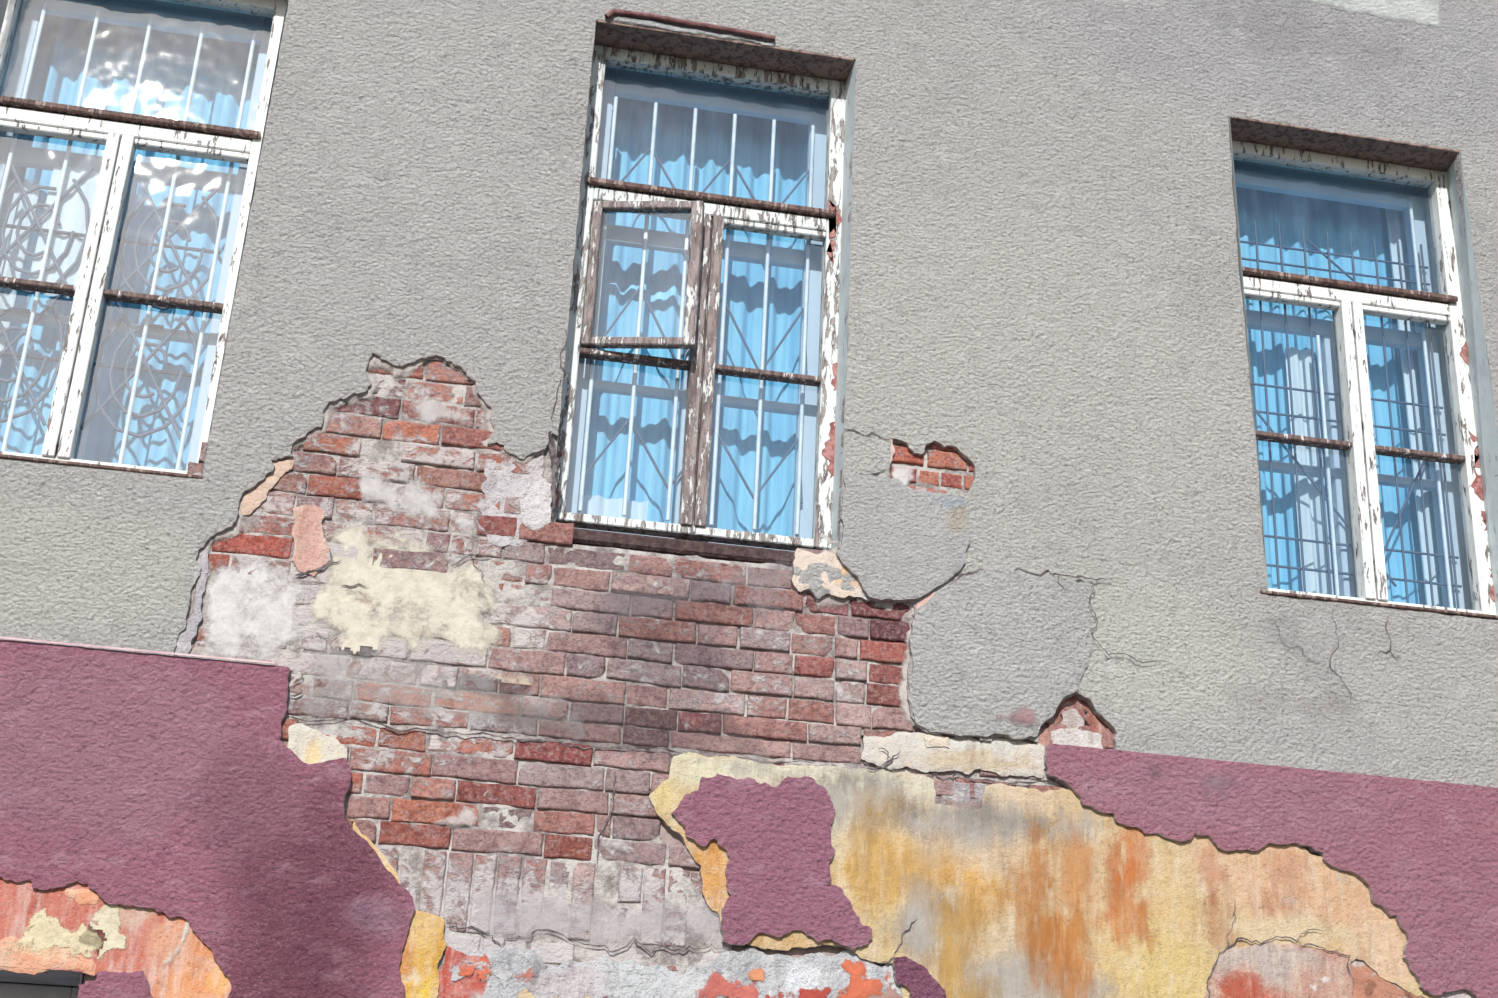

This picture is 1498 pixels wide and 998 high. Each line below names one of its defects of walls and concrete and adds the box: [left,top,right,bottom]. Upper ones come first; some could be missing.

peeling [826,200,842,264]
peeling [1459,341,1469,365]
peeling [1469,431,1487,531]
spalling [174,355,1474,998]
crack [949,568,1170,663]
crack [1268,610,1361,709]
spalling [0,877,232,998]